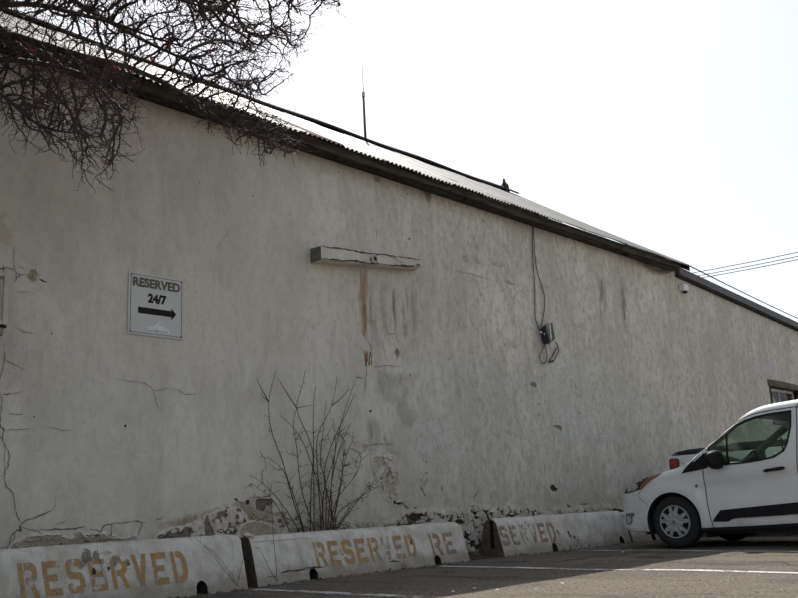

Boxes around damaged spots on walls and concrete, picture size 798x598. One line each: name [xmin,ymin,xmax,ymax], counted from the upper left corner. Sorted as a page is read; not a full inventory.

crack [0,352,162,549]
spalling [8,530,139,575]
peeling [154,495,356,539]
peeling [370,451,624,553]